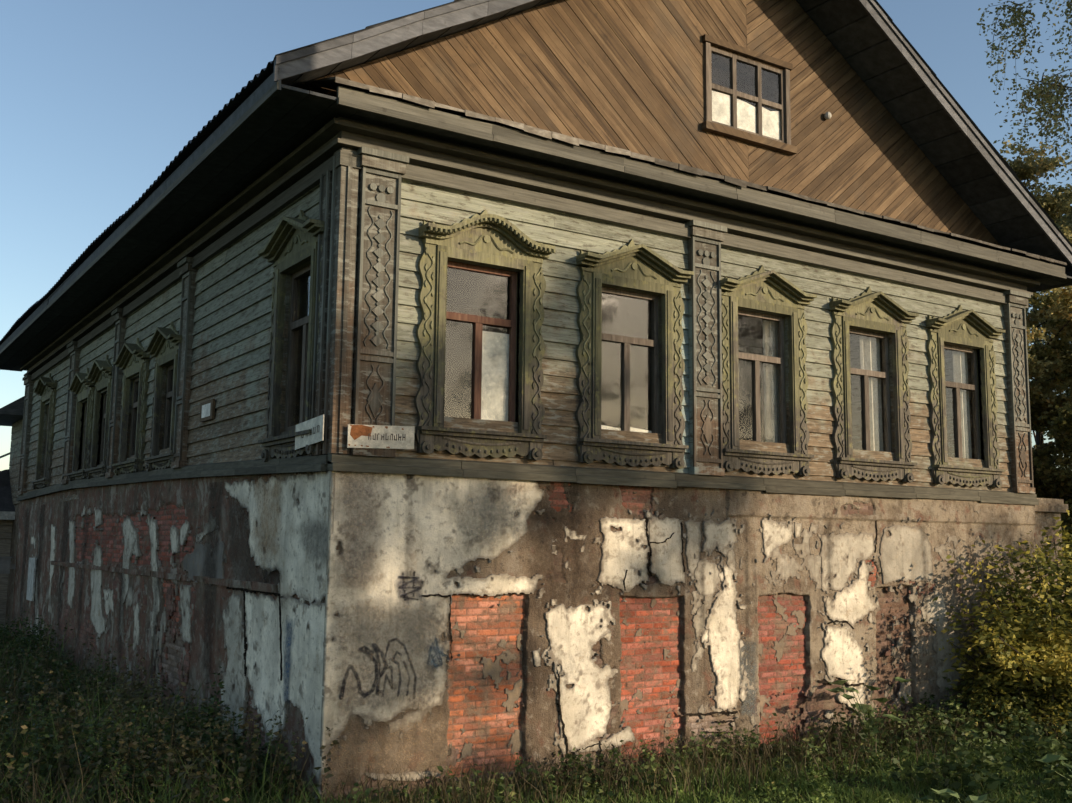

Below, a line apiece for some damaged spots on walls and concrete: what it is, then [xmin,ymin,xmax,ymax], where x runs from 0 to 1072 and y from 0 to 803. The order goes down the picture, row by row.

peeling [57,470,760,803]
crack [623,516,685,591]
peeling [755,514,802,563]
peeling [795,502,965,737]